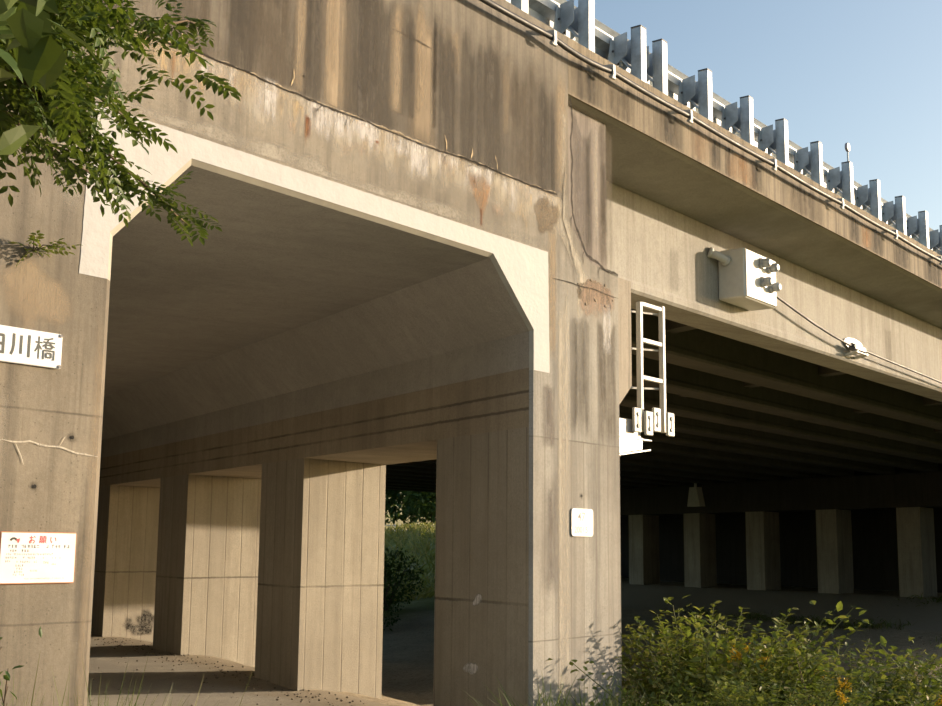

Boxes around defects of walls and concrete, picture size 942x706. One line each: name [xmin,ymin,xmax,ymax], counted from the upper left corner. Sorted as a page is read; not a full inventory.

water stain [154,49,206,86]
crack [135,30,619,317]
water stain [712,142,730,174]
water stain [587,135,611,254]
spalling [577,279,614,314]
water stain [219,0,589,689]
crack [0,436,97,465]